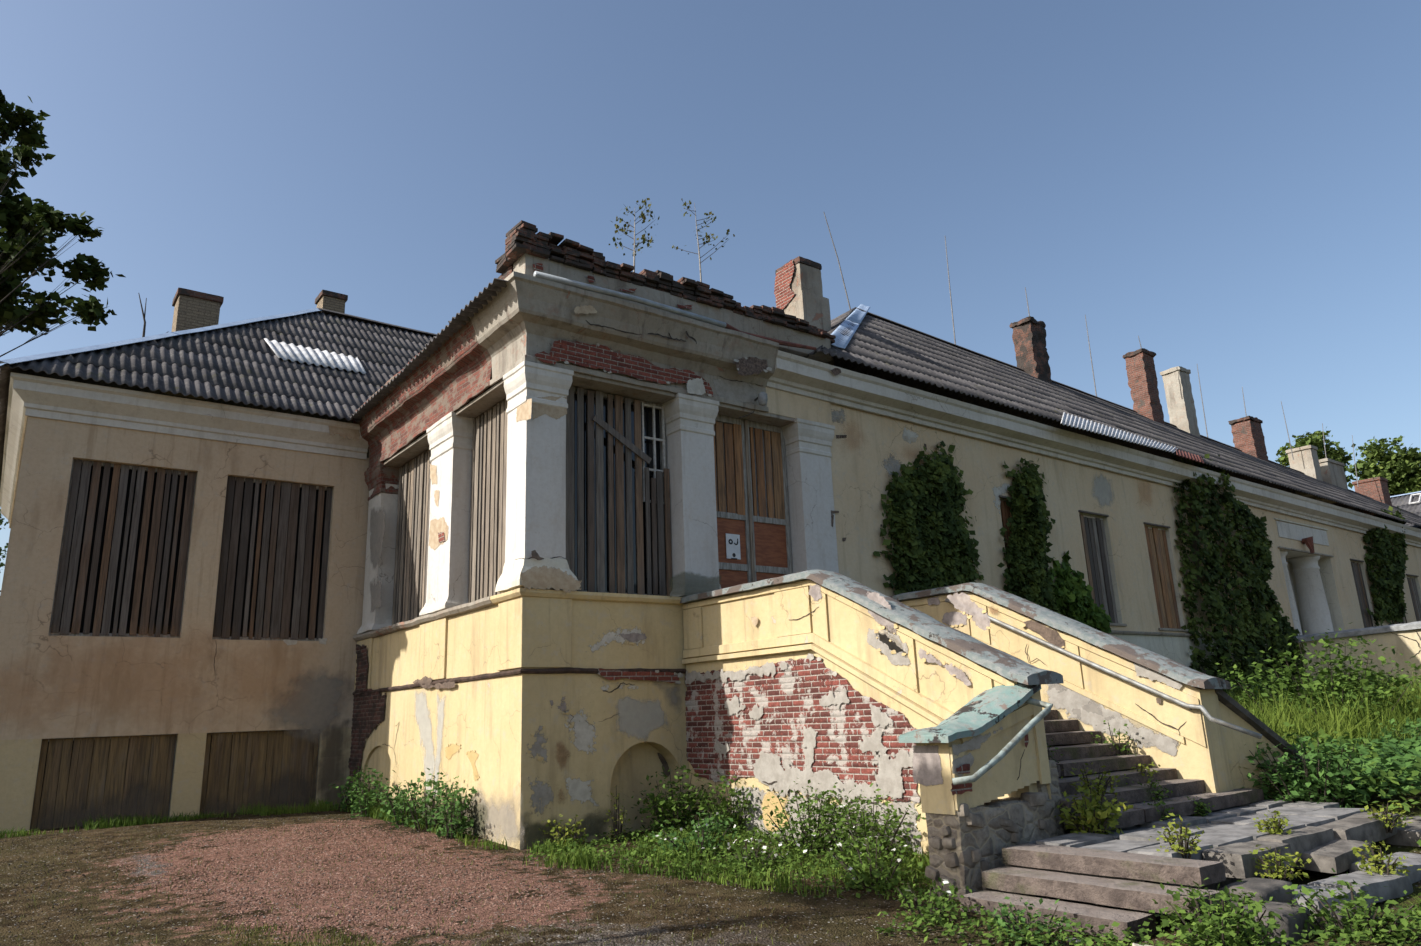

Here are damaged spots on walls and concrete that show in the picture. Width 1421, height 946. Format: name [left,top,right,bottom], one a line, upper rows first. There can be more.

flaking render [535,340,757,403]
peeling [867,591,971,686]
flaking render [0,644,879,946]
flaking render [598,653,1003,854]